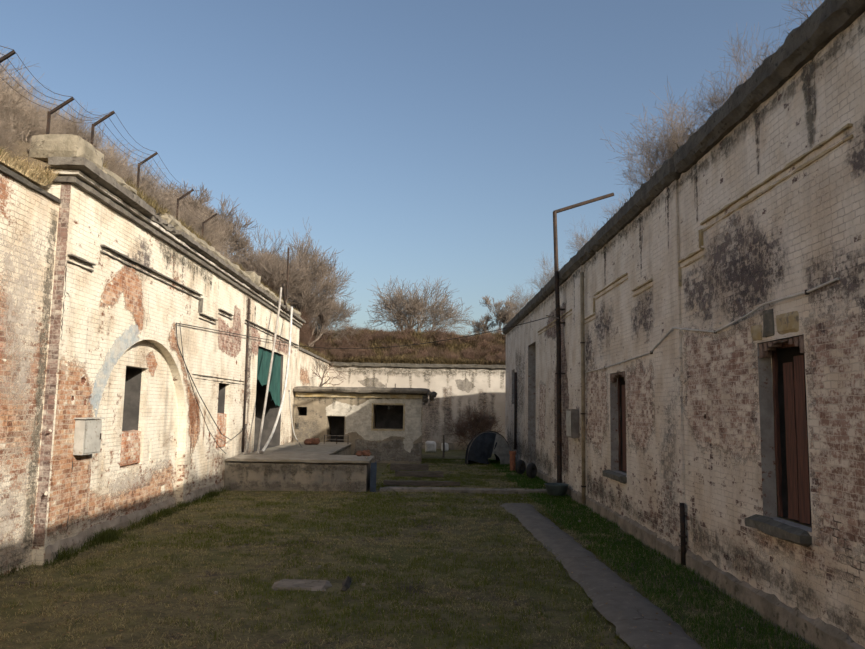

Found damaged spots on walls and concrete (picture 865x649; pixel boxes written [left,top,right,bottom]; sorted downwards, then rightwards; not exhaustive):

leakage [507,12,865,337]
peeling [0,183,174,546]
peeling [625,358,655,454]
peeling [678,319,761,467]
peeling [747,297,865,592]